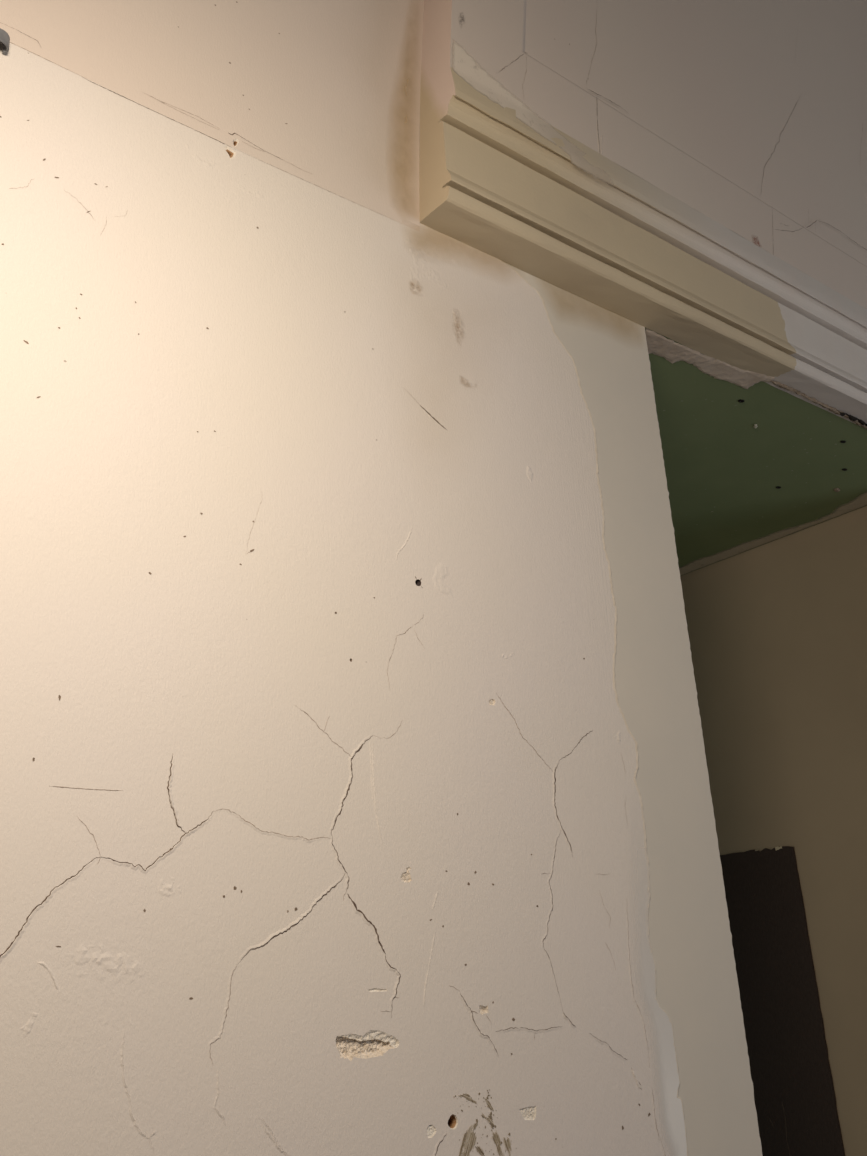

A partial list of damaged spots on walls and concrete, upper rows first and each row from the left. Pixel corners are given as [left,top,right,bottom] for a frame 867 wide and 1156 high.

crack [0,710,401,1126]
flaking render [336,1030,400,1061]
crack [450,693,627,1061]